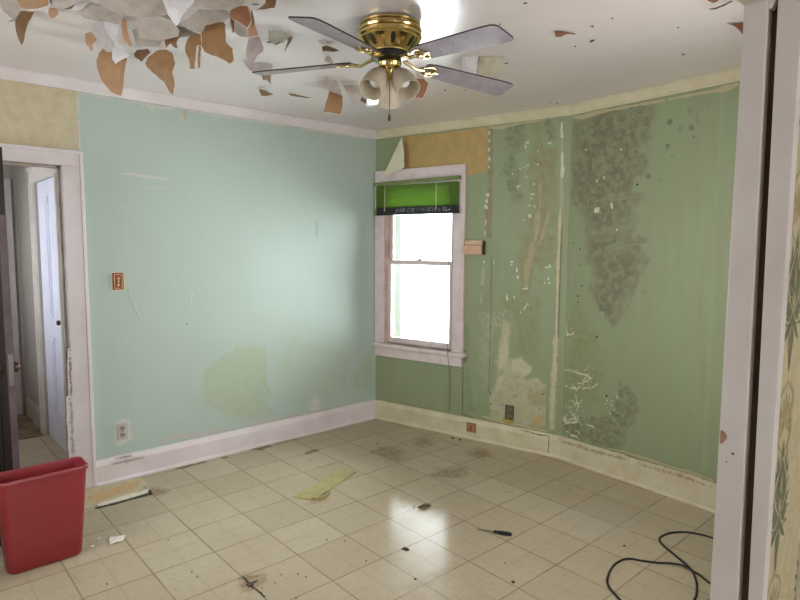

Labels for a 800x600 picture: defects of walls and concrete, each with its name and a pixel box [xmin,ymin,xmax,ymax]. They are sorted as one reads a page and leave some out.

peeling [0,0,293,150]
peeling [317,40,339,64]
peeling [318,79,378,115]
peeling [403,127,488,175]
leakage [491,98,701,363]
spalling [484,303,547,426]
leakage [558,356,716,492]